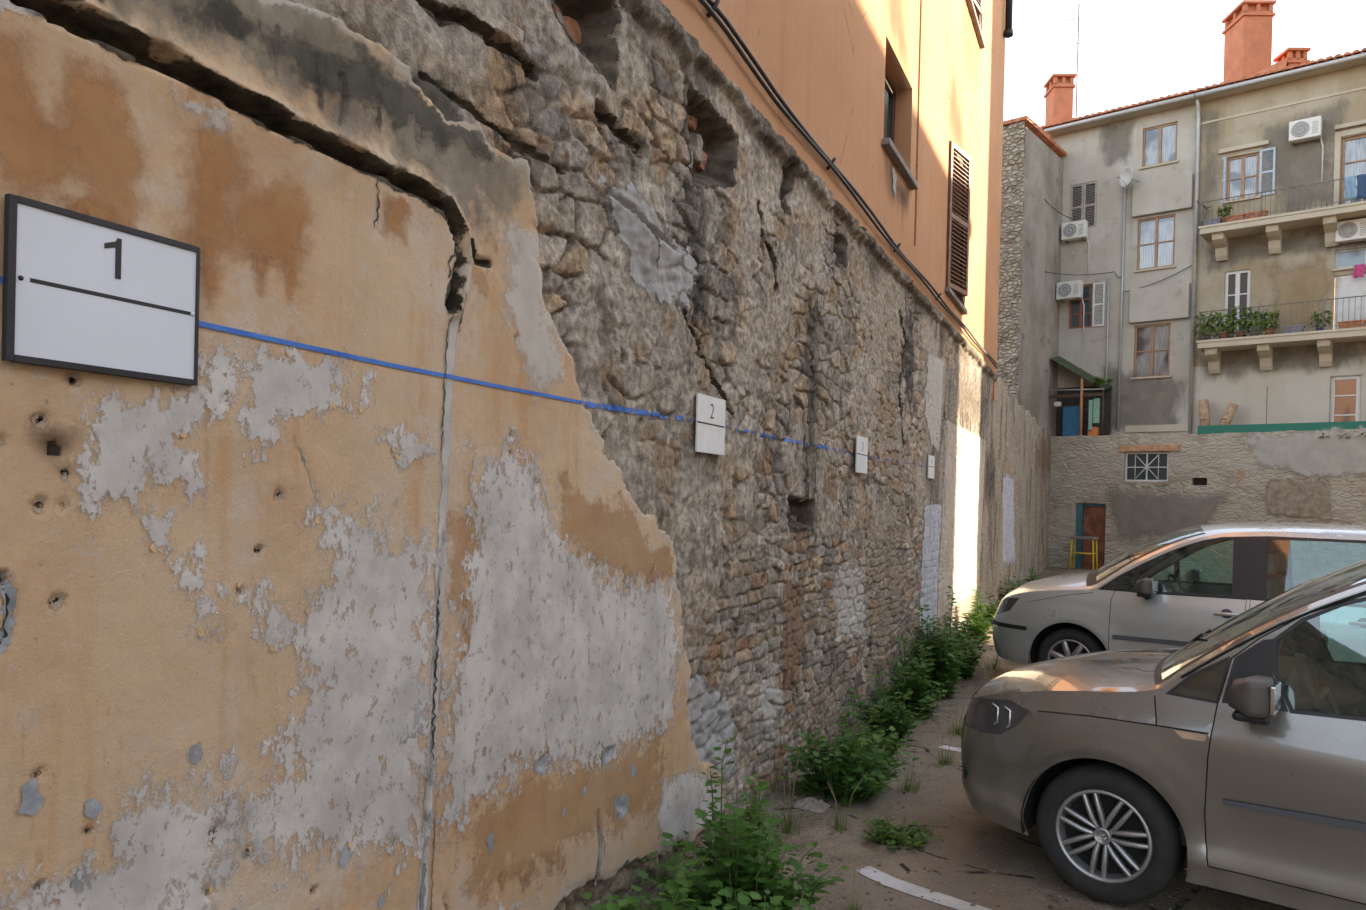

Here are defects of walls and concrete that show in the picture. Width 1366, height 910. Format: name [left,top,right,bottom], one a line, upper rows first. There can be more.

water stain [175,90,306,297]
crack [415,0,565,175]
spalling [650,85,739,189]
crack [9,0,469,910]
peeling [0,334,686,910]